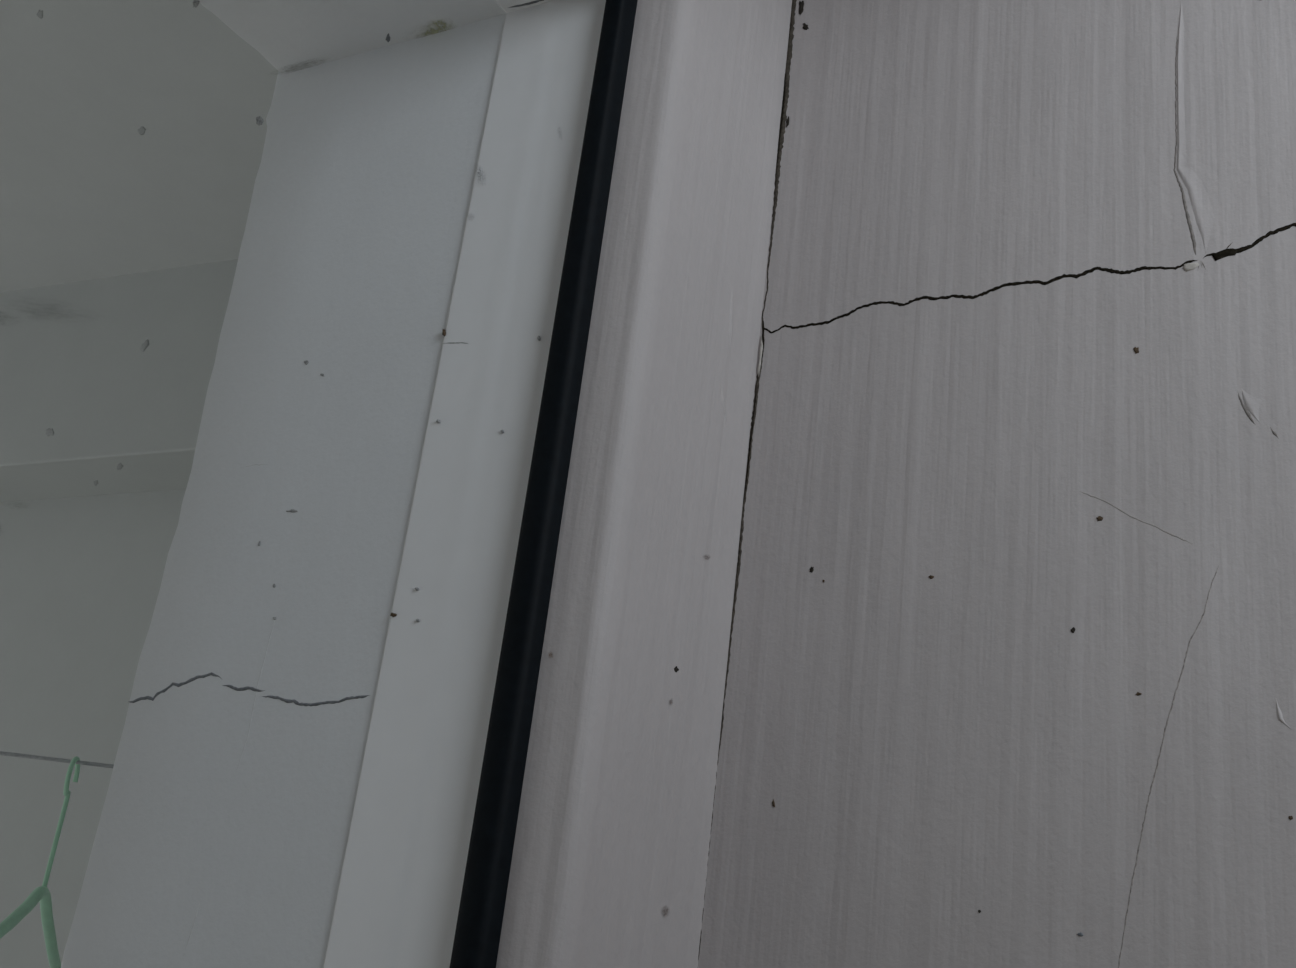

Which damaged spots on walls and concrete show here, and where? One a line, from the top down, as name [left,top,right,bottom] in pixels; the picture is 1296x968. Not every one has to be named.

crack [128,672,369,706]
crack [697,0,1296,968]